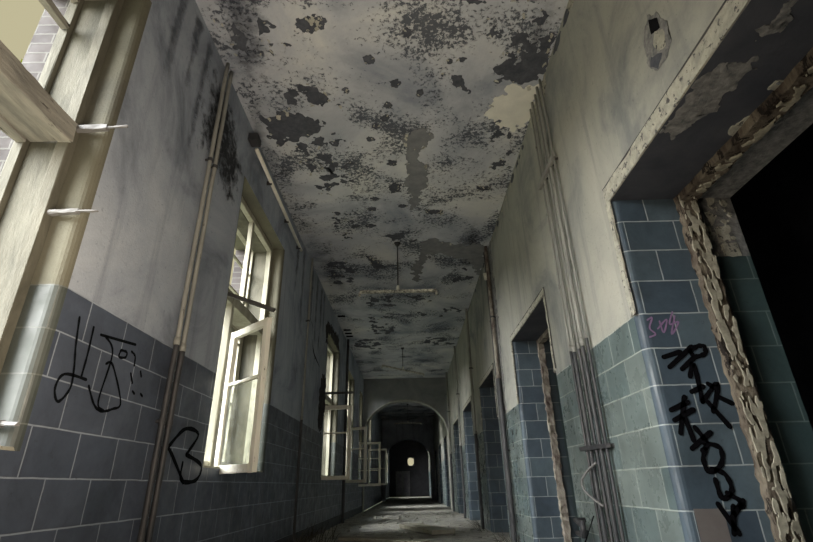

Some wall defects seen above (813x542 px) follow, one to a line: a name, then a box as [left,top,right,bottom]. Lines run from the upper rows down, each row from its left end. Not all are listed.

peeling [257,17,292,55]
peeling [259,84,360,196]
peeling [295,14,327,34]
peeling [366,101,393,142]
peeling [387,128,443,215]
peeling [441,73,471,94]
peeling [484,0,574,143]
peeling [659,55,759,140]
peeling [755,0,798,42]
peeling [352,295,396,350]
peeling [384,145,524,414]
peeling [678,66,813,542]